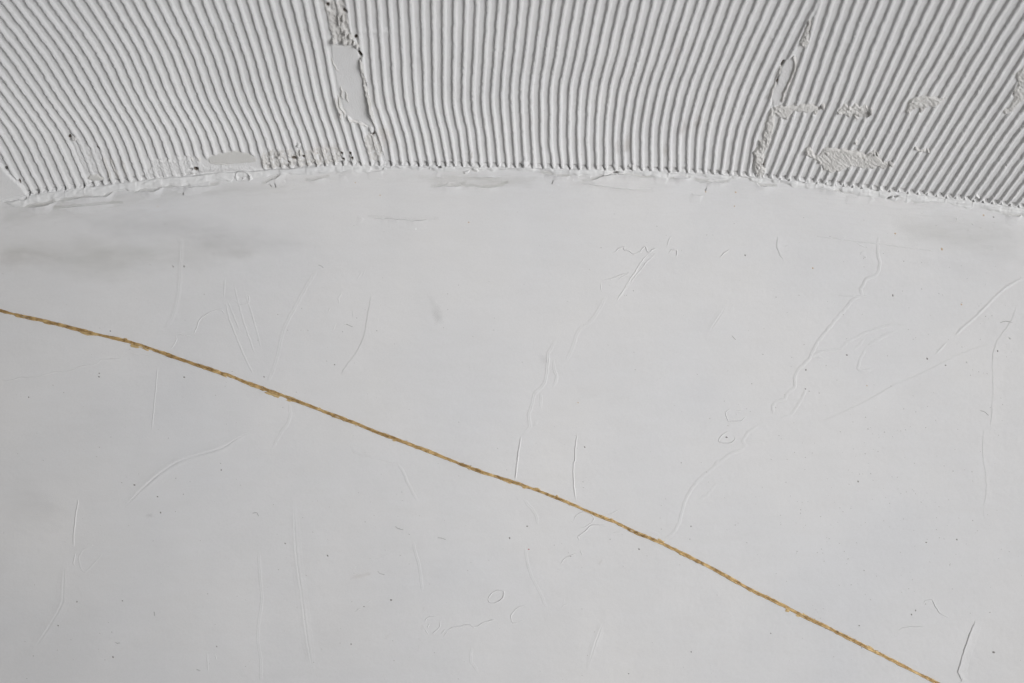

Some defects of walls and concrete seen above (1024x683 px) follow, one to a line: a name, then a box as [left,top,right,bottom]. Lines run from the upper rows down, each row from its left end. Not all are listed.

peeling [768,43,804,103]